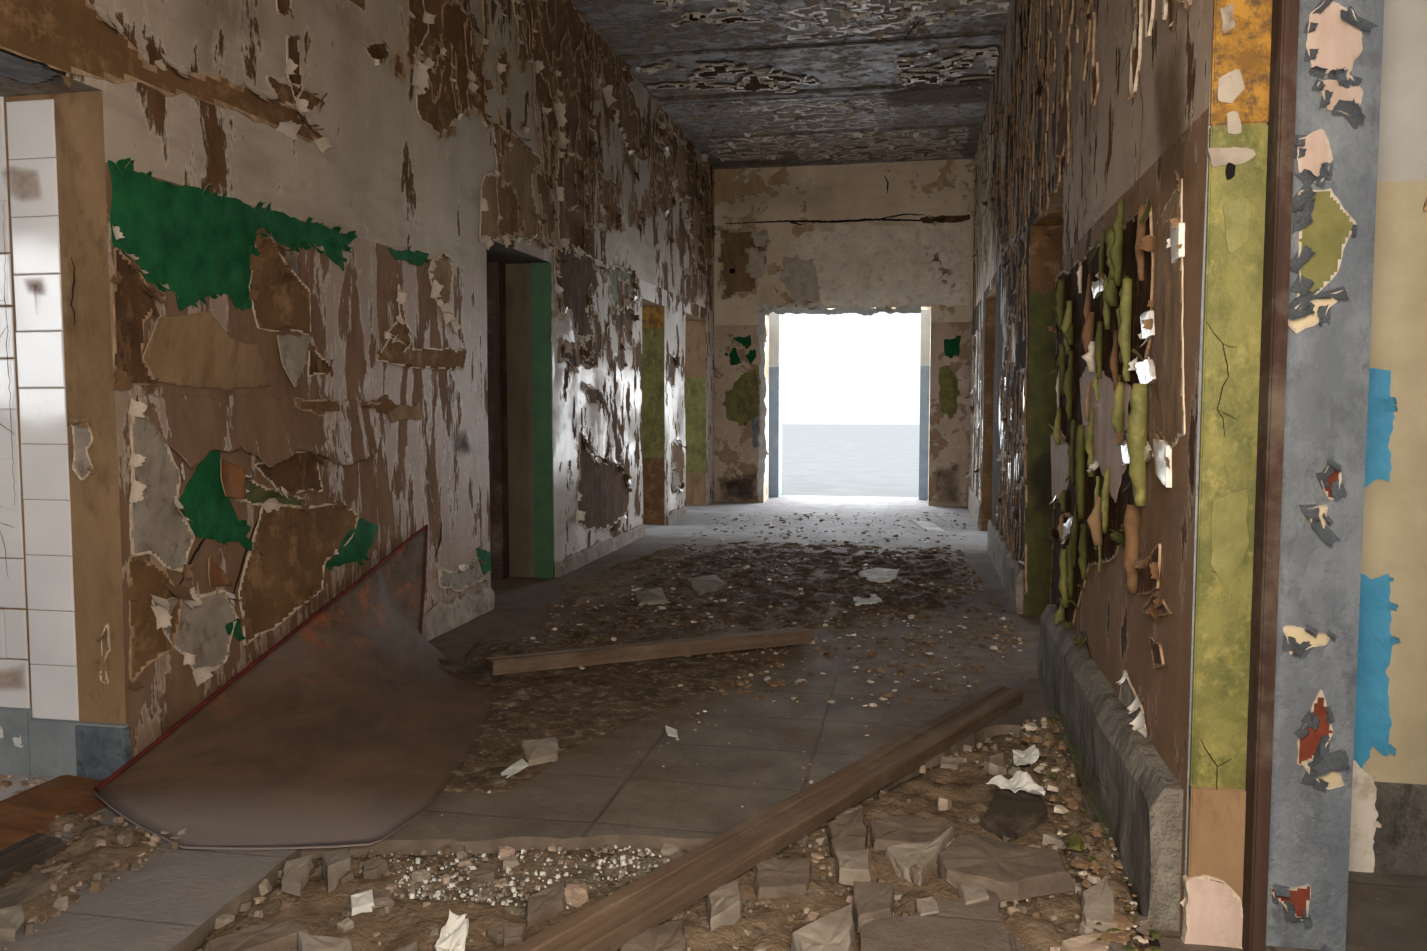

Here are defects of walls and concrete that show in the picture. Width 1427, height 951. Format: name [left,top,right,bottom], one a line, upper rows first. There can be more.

peeling [0,0,337,153]
peeling [1304,0,1378,129]
peeling [116,157,153,179]
crack [725,176,959,225]
peeling [1288,129,1358,334]
peeling [110,201,423,690]
peeling [1299,458,1347,546]
peeling [96,623,111,684]
peeling [1282,624,1337,659]
peeling [1116,670,1148,738]
peeling [1294,689,1351,792]
peeling [1270,884,1313,927]